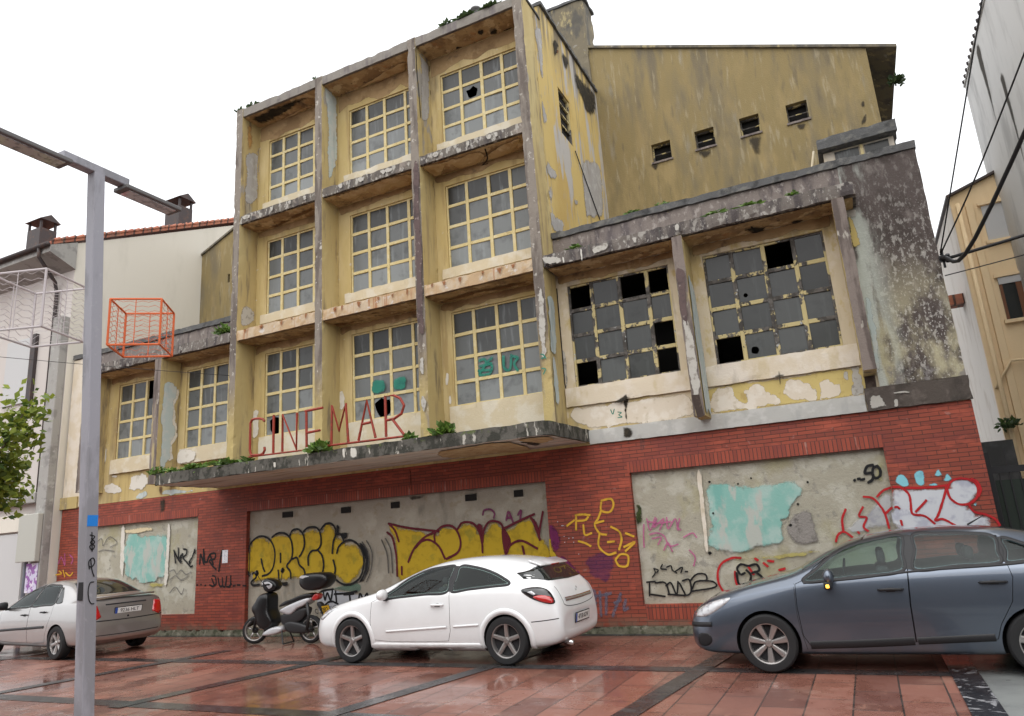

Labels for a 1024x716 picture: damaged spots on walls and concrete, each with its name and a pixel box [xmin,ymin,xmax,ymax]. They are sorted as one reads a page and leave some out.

peeling [325,88,355,188]
peeling [242,153,258,219]
peeling [575,160,603,218]
peeling [571,268,909,428]
peeling [160,382,196,468]
peeling [104,473,148,499]
peeling [120,524,170,586]
peeling [697,469,818,555]